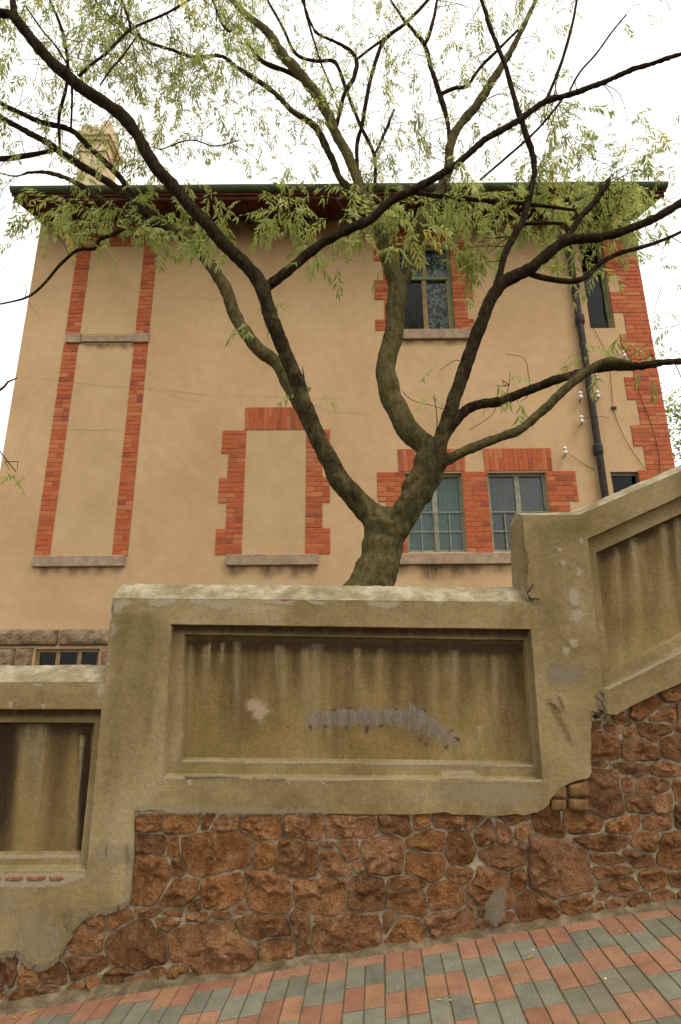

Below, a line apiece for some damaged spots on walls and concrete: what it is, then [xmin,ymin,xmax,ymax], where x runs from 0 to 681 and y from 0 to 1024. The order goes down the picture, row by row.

flaking render [590,650,681,721]
peeling [246,698,270,723]
flaking render [550,780,589,811]